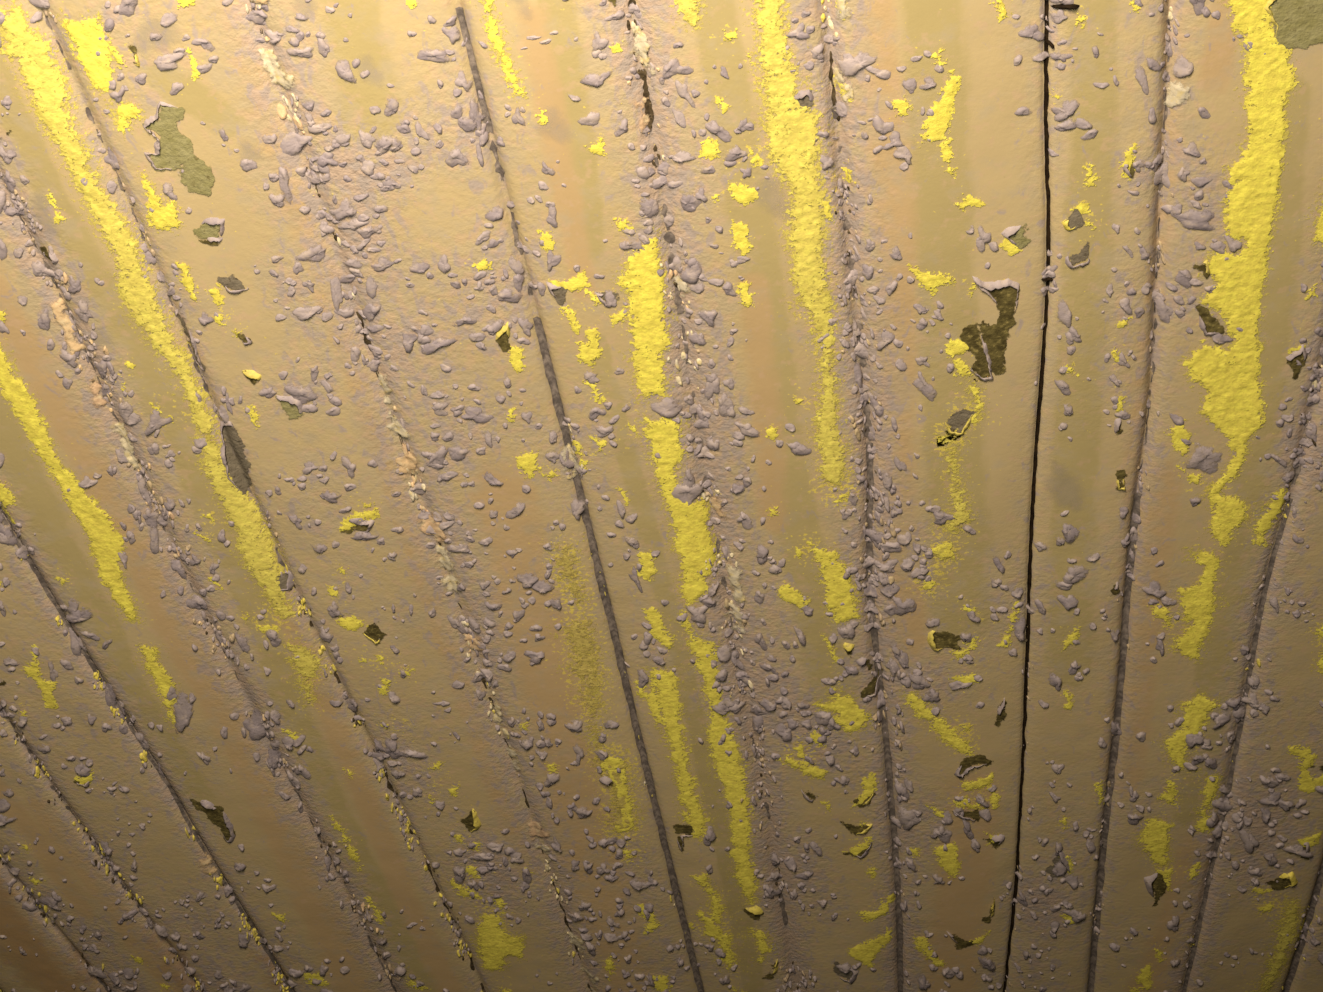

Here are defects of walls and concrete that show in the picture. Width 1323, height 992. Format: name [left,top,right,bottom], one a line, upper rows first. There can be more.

peeling [920,48,962,179]
peeling [1118,143,1140,181]
peeling [955,193,986,211]
peeling [1061,202,1097,269]
peeling [0,0,330,711]
peeling [1147,0,1301,664]
peeling [1286,343,1309,379]
peeling [1115,470,1127,491]
peeling [338,502,380,534]
peeling [335,614,416,695]
peeling [190,799,236,843]
peeling [1130,689,1231,907]